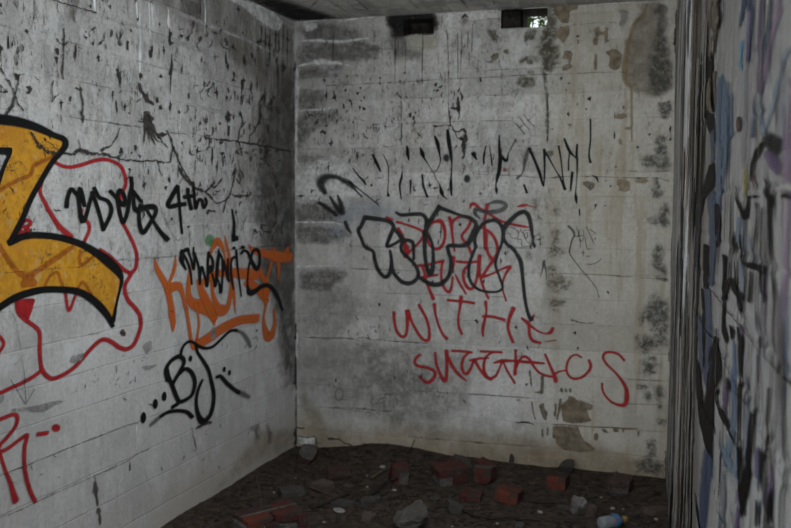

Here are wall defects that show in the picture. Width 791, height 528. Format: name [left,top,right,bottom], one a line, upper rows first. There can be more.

crack [0,68,24,115]
crack [31,0,292,228]
water stain [539,6,558,141]
water stain [623,4,671,139]
water stain [644,136,668,167]
water stain [636,297,669,373]
peeling [525,370,624,452]